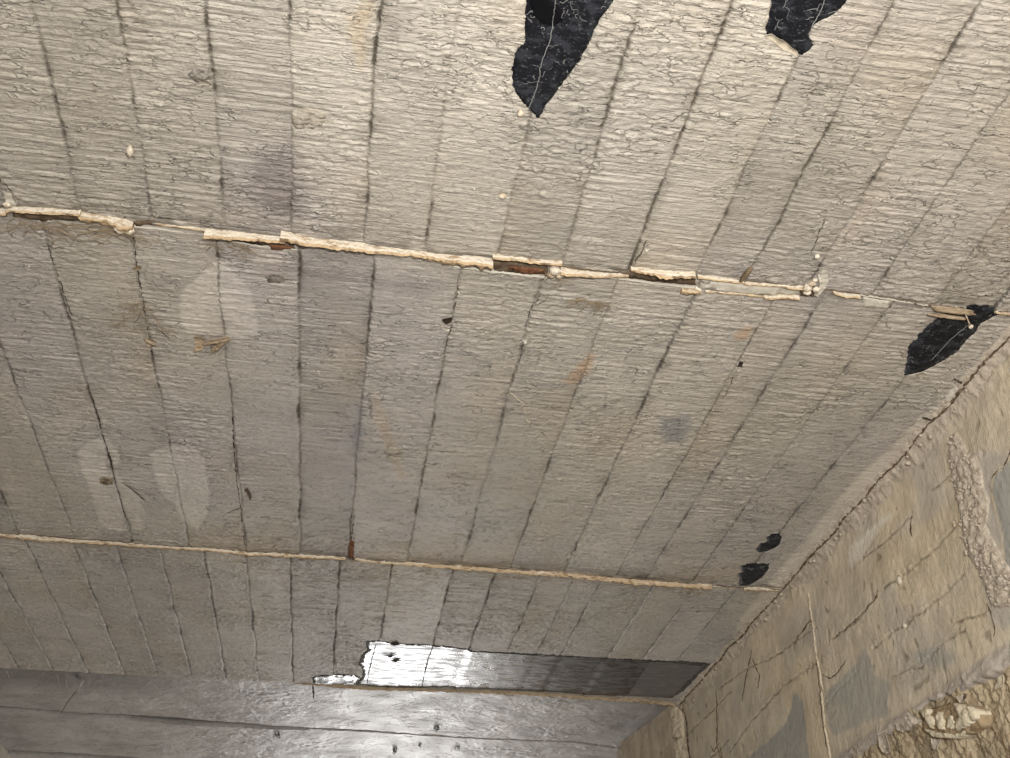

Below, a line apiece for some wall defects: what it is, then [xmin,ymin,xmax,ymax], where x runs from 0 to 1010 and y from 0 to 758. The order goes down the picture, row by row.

peeling [512,0,613,119]
peeling [765,0,847,56]
crack [0,179,20,207]
crack [47,242,72,315]
crack [132,234,169,356]
crack [440,277,461,354]
crack [519,294,547,362]
crack [633,240,651,267]
peeling [904,304,998,379]
peeling [738,534,782,586]
crack [674,326,1010,758]
peeling [311,640,711,758]